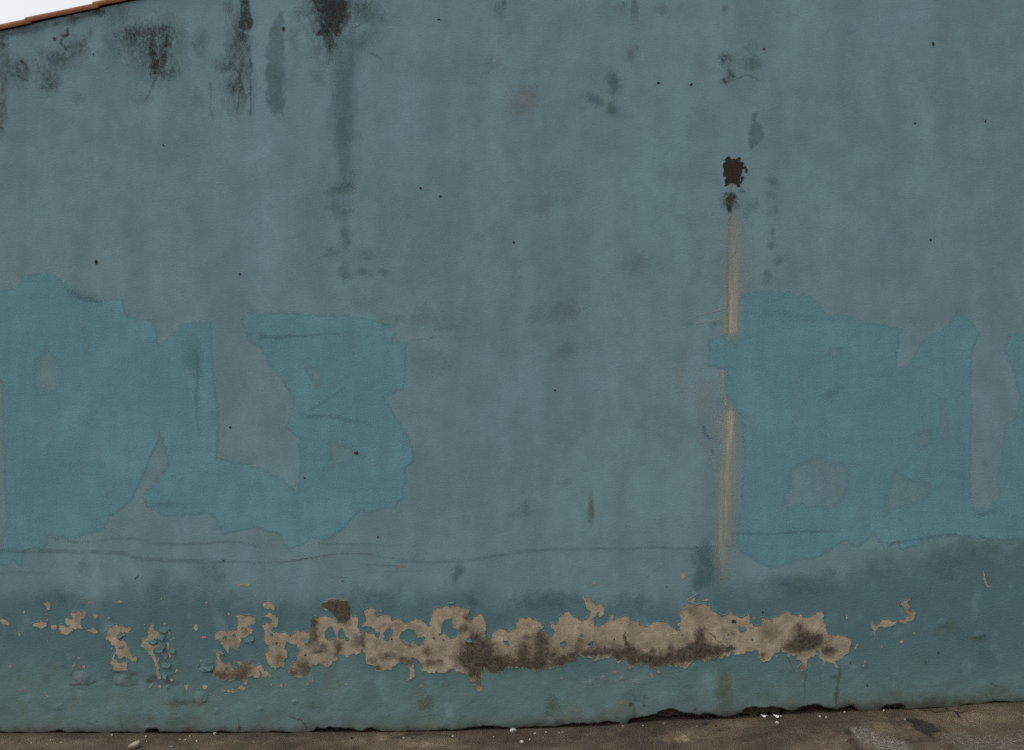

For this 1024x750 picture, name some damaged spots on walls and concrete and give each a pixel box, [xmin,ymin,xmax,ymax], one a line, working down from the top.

damp [237,0,253,37]
damp [313,0,347,49]
rust [725,212,739,335]
peeling [23,597,188,690]
peeling [194,582,859,693]
peeling [870,597,917,648]